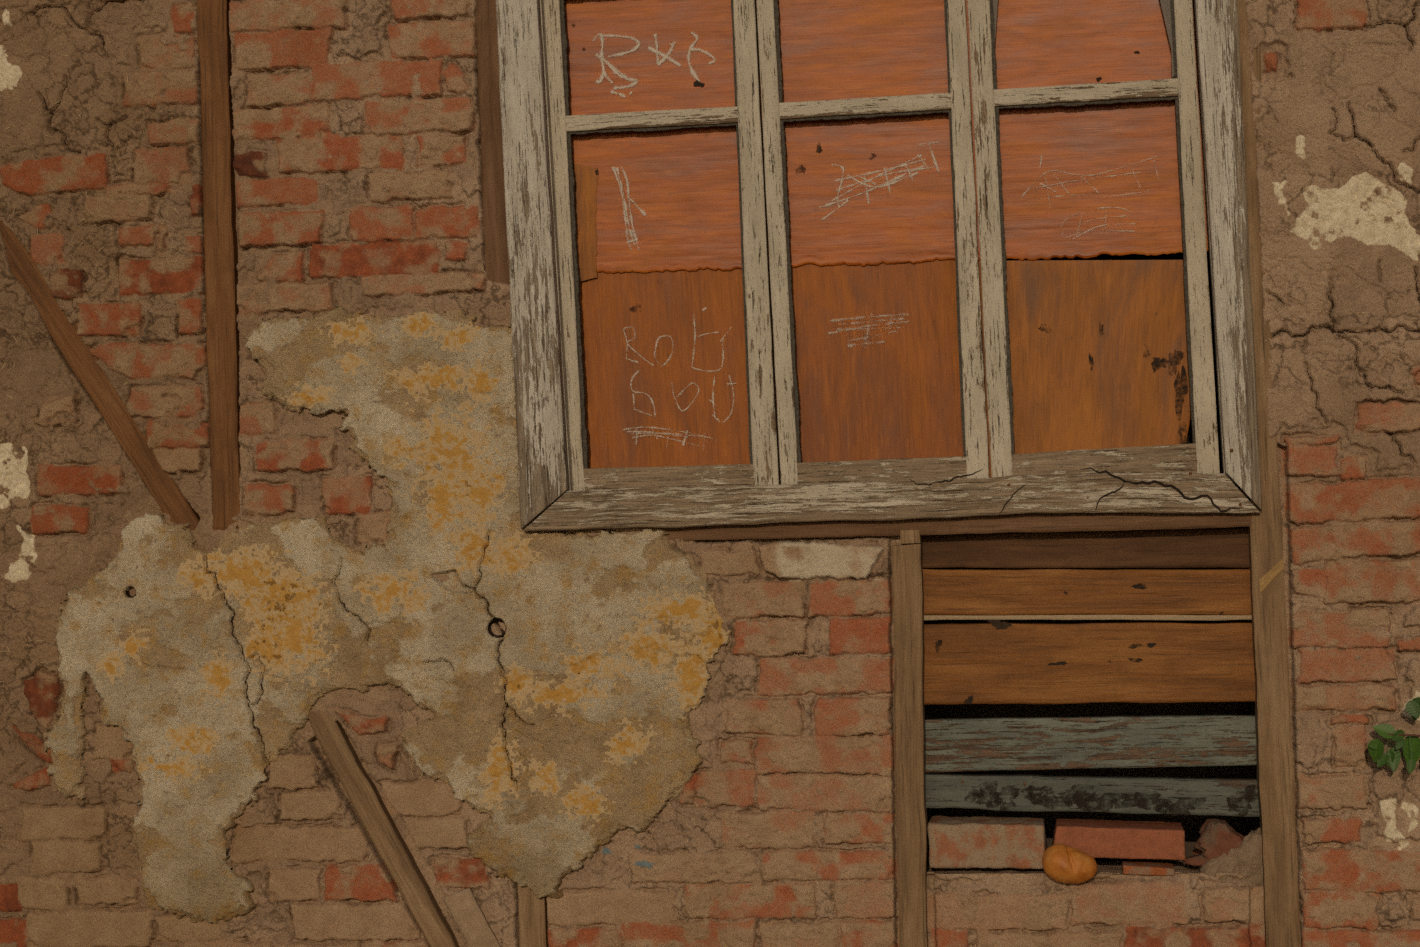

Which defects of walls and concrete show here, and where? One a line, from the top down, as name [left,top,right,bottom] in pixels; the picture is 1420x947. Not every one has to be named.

crack [23,0,144,55]
crack [1366,5,1420,51]
crack [42,76,127,153]
crack [1330,90,1420,193]
crack [1273,268,1420,423]
peeling [0,0,899,947]
crack [206,562,270,764]
crack [334,560,371,641]
crack [465,533,534,791]
spalling [1276,365,1420,947]